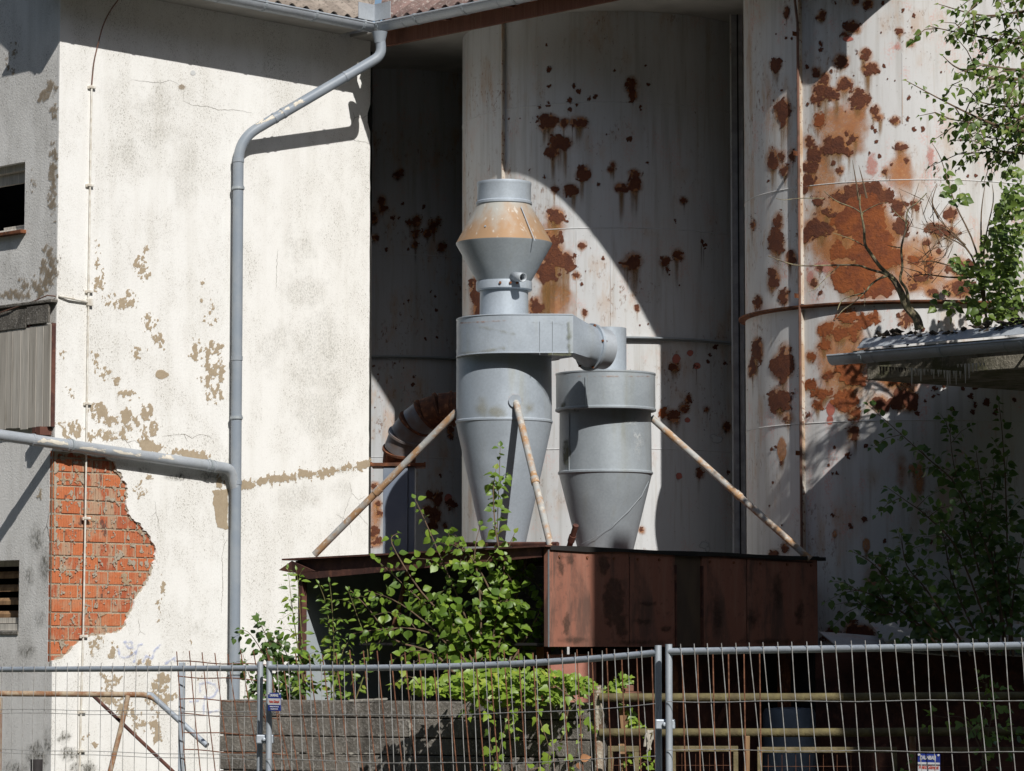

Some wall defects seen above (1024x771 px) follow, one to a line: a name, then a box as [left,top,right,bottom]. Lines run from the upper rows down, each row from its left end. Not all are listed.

rust [620,78,651,111]
peeling [92,239,165,359]
rust [372,196,447,252]
rust [529,161,649,314]
rust [660,250,684,286]
rust [747,0,977,460]
peeling [188,338,226,405]
rust [658,390,692,423]
flaking render [38,351,569,771]